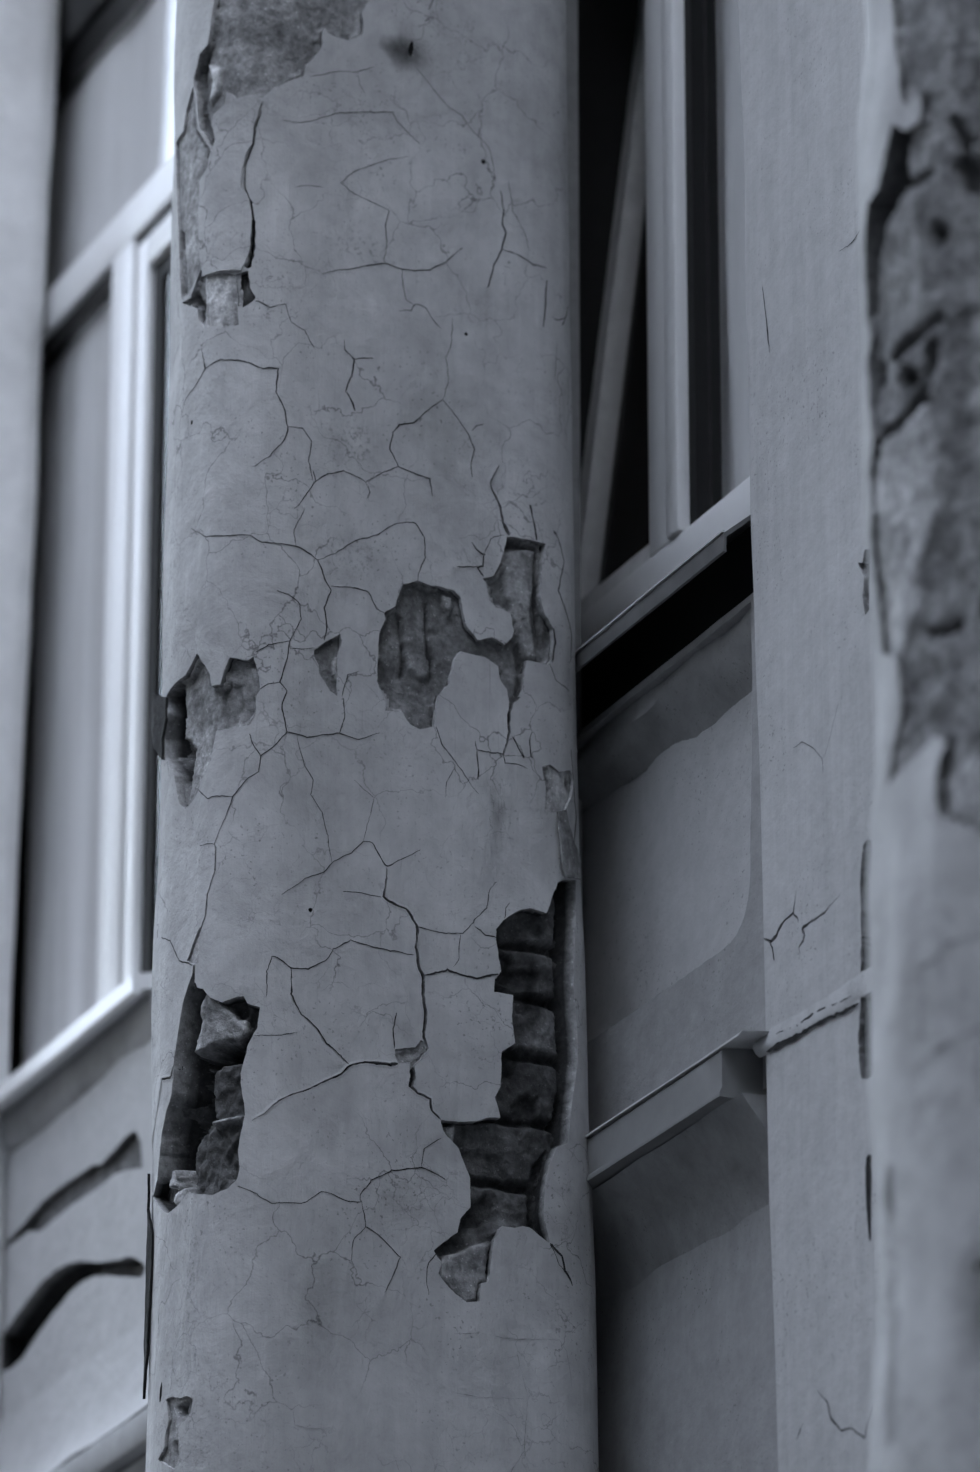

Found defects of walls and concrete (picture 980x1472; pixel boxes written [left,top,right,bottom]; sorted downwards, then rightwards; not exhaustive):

spalling [176,0,370,327]
spalling [858,0,980,832]
spalling [151,654,260,810]
crack [162,67,573,1292]
spalling [377,537,554,729]
spalling [1,927,260,1399]
crack [152,1065,183,1228]
spalling [434,765,581,1302]
crack [764,840,869,1079]
spalling [158,1396,193,1469]
crack [796,1391,872,1440]